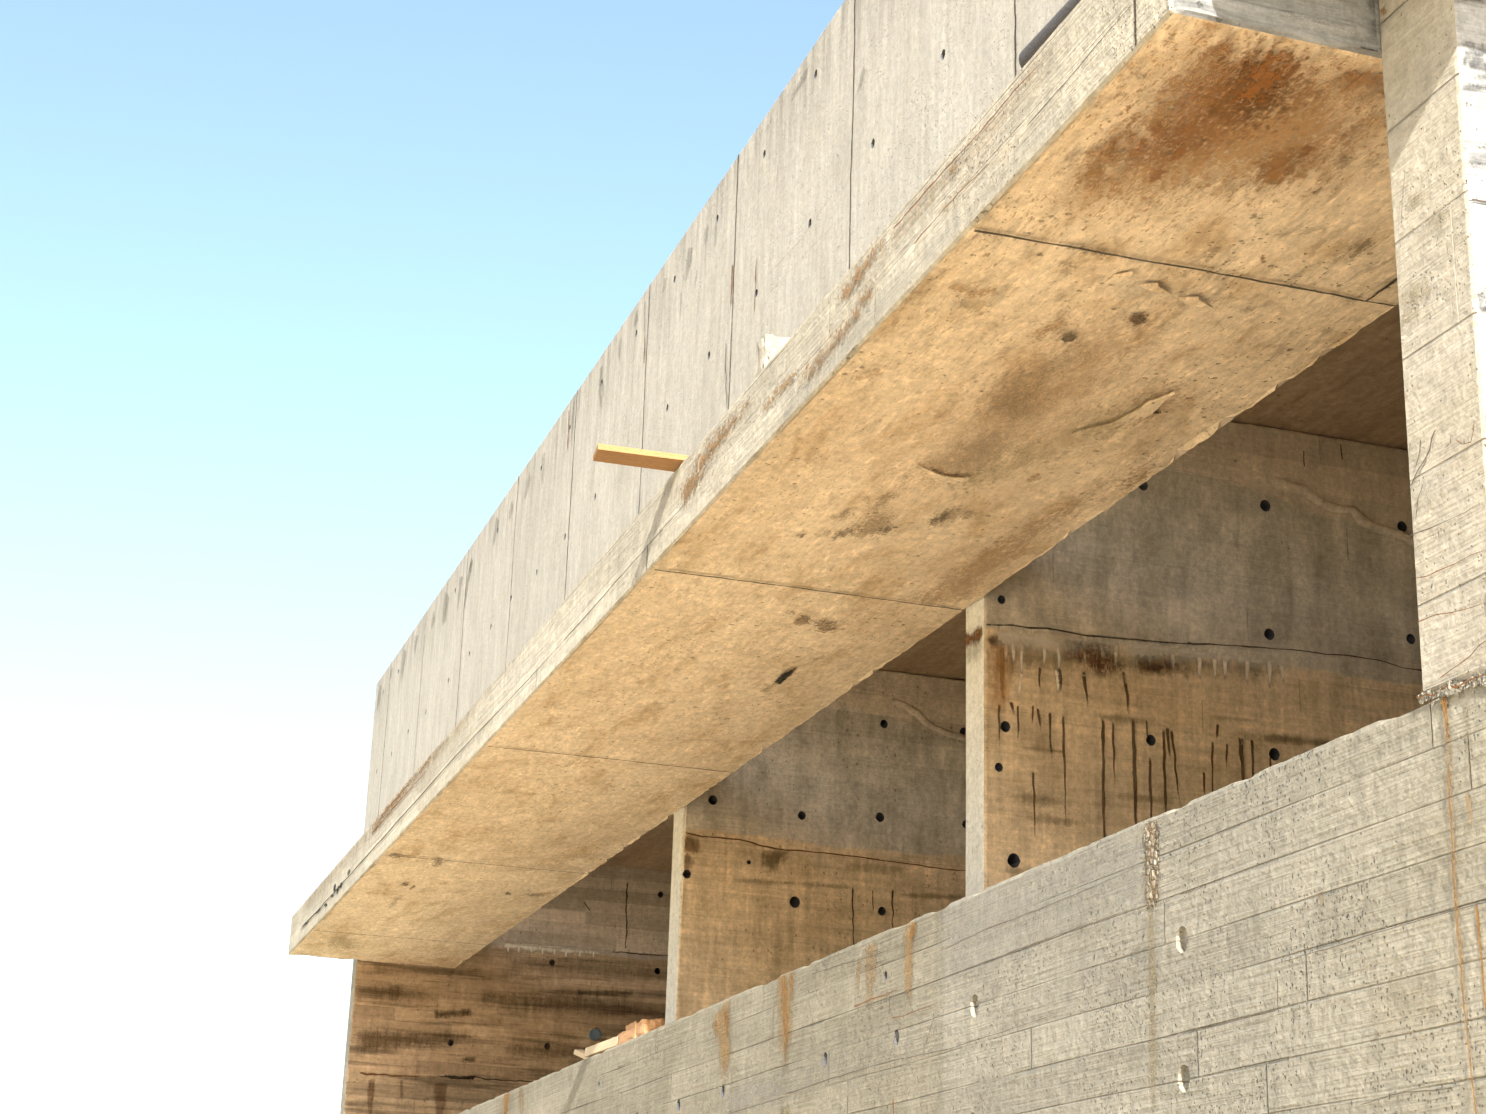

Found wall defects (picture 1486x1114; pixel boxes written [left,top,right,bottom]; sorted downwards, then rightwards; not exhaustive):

damp [998,632,1309,838]
corrosion [1448,770,1477,1114]
corrosion [1476,905,1486,1009]
corrosion [716,1003,729,1068]
corrosion [781,975,793,1046]